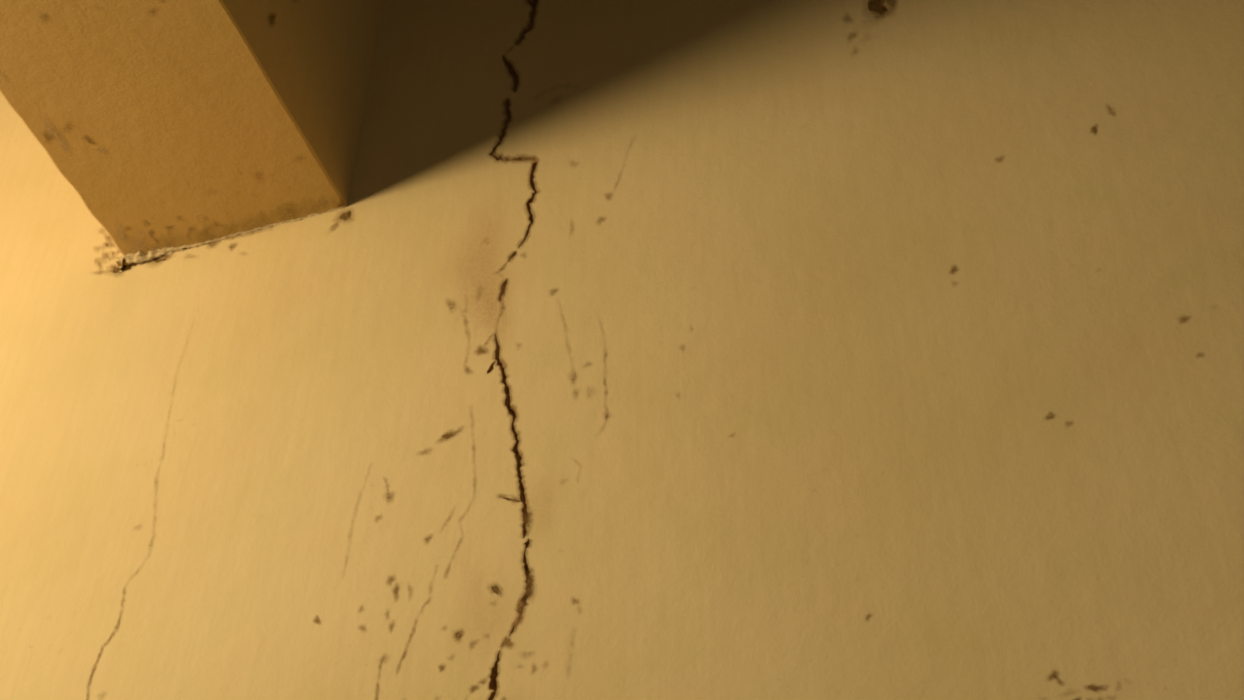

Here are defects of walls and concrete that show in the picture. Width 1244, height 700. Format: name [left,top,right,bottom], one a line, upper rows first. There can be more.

flaking render [112,201,351,274]
crack [477,0,538,700]